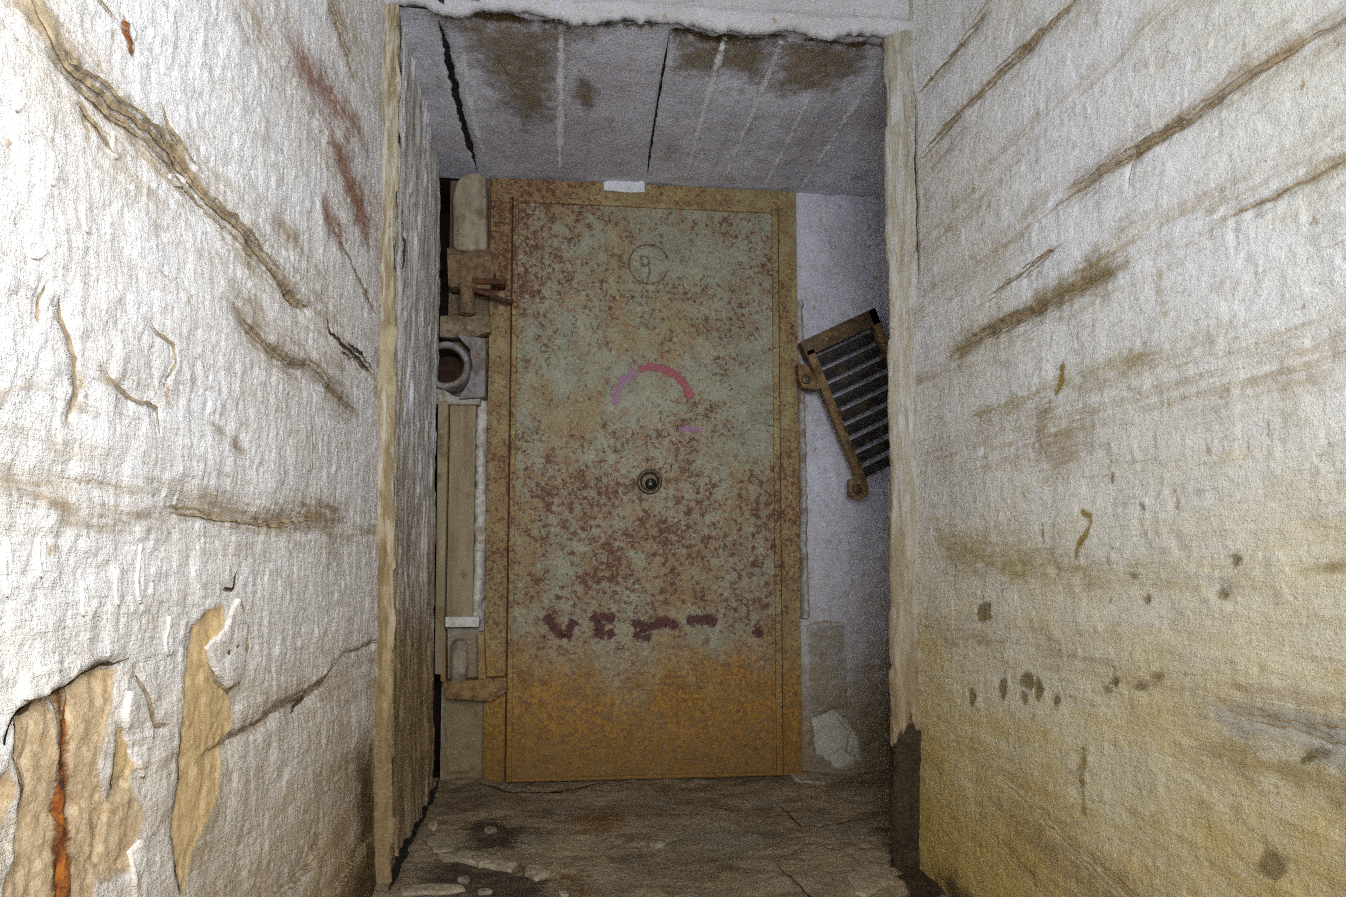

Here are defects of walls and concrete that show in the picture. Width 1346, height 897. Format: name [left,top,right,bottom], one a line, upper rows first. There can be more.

corrosion [290,40,371,248]
crack [438,0,485,169]
crack [400,208,408,275]
corrosion [448,289,489,316]
peeling [113,543,145,606]
spalling [0,572,249,897]
crack [195,636,396,763]
crack [269,778,440,897]
crack [390,674,398,782]
crack [474,780,609,793]